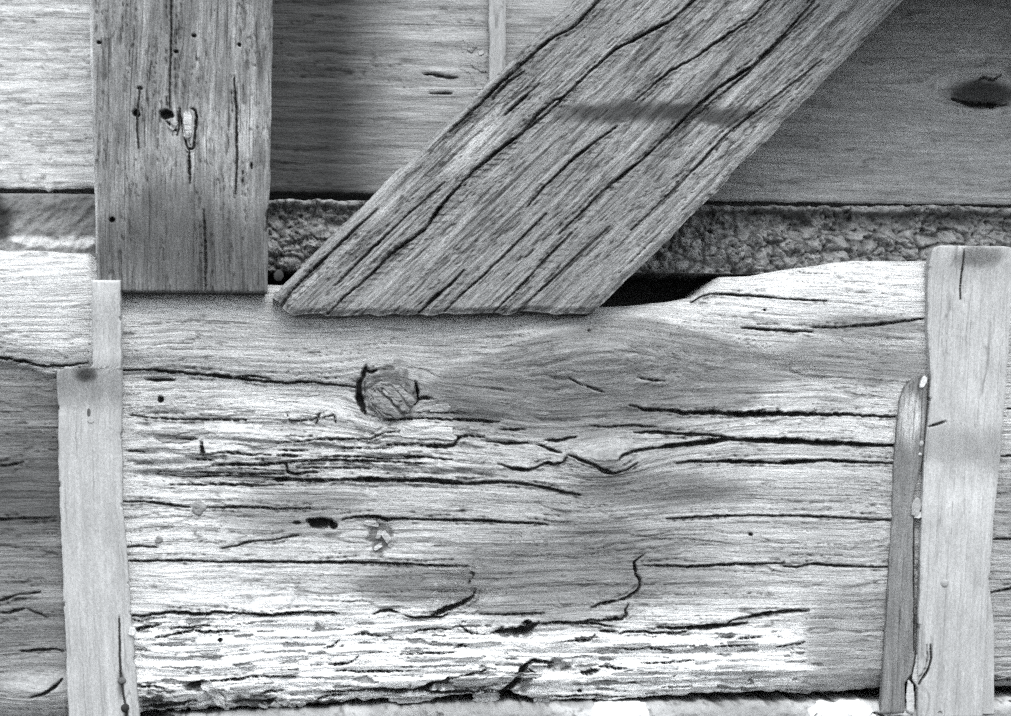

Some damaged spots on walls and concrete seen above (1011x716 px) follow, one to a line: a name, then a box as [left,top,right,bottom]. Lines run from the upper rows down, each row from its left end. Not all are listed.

crack [167,0,175,108]
crack [134,88,142,148]
crack [185,151,193,183]
crack [232,77,240,194]
crack [280,0,827,314]
crack [123,366,896,510]
crack [343,515,547,525]
crack [0,592,47,618]
crack [22,646,63,654]
crack [32,679,62,698]
crack [118,534,888,708]
crack [667,514,932,684]